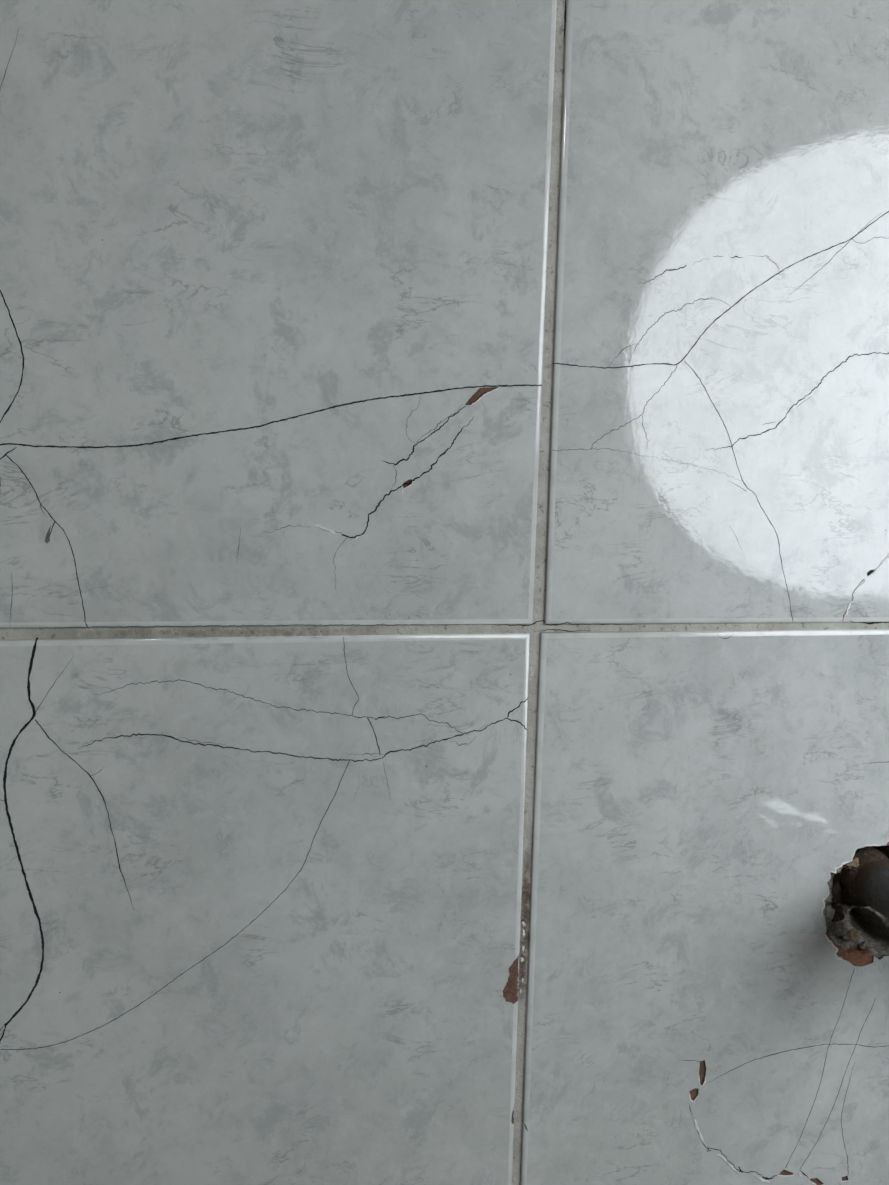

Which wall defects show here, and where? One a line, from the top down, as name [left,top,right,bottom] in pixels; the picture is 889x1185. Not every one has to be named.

crack [0,211,889,1050]
spalling [503,952,520,1004]
crack [684,970,888,1183]
spalling [822,842,889,966]